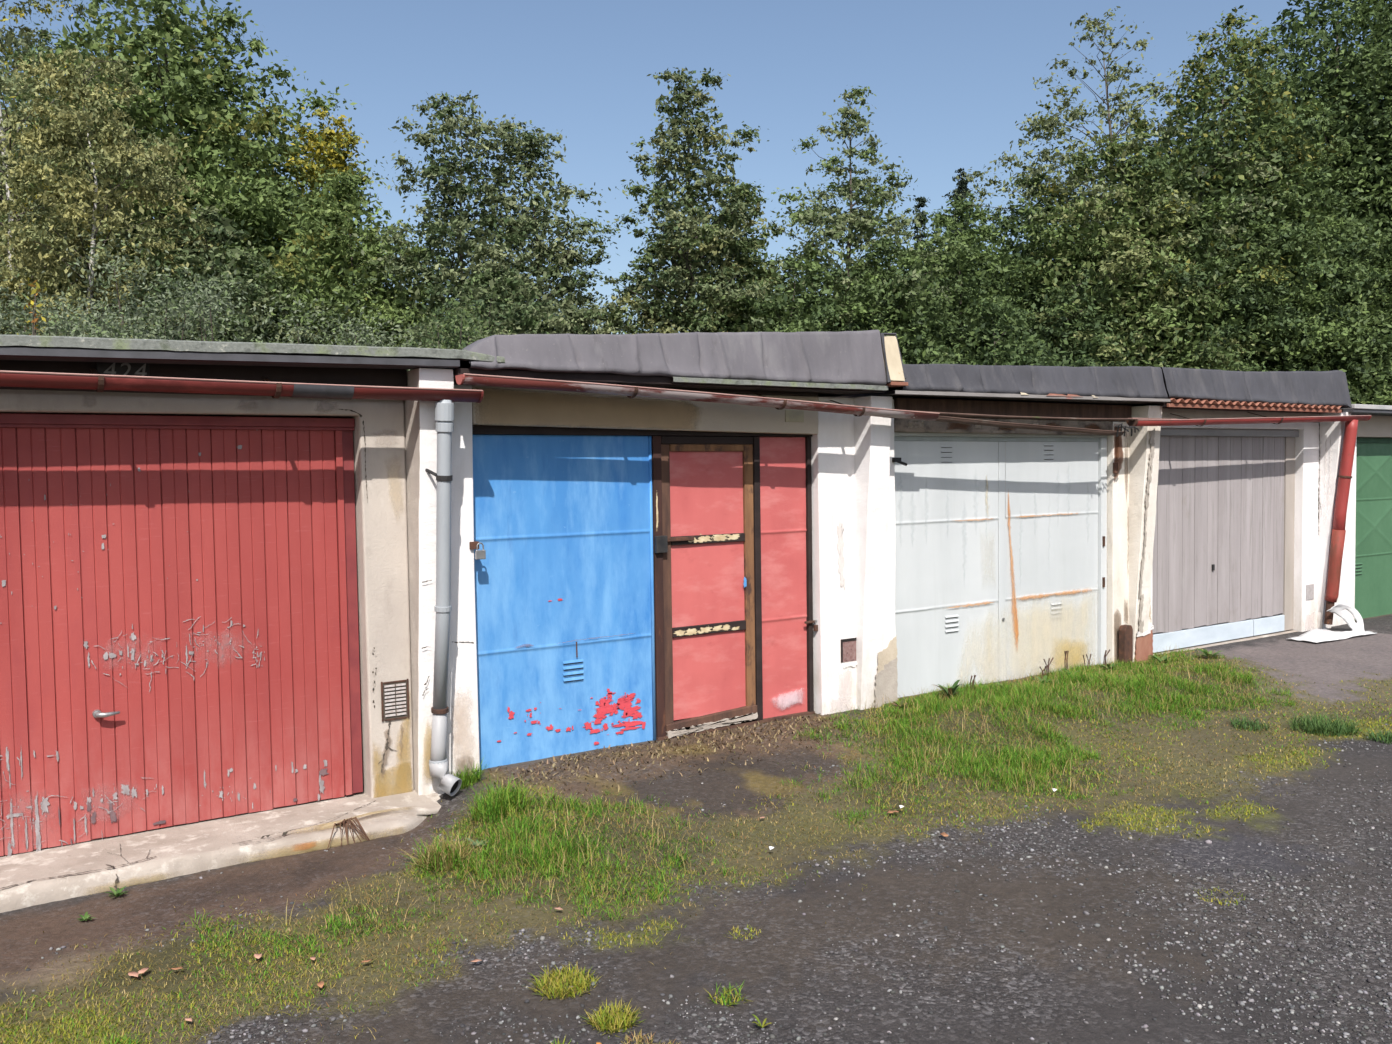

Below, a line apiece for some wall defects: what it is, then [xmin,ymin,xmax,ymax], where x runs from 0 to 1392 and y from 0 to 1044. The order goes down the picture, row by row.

peeling [689,534,740,543]
rust [955,478,1088,649]
peeling [84,624,166,675]
peeling [185,621,245,665]
peeling [674,624,740,636]
leakage [961,600,1090,683]
peeling [497,688,646,745]
leakage [381,727,403,775]
peeling [0,747,164,857]